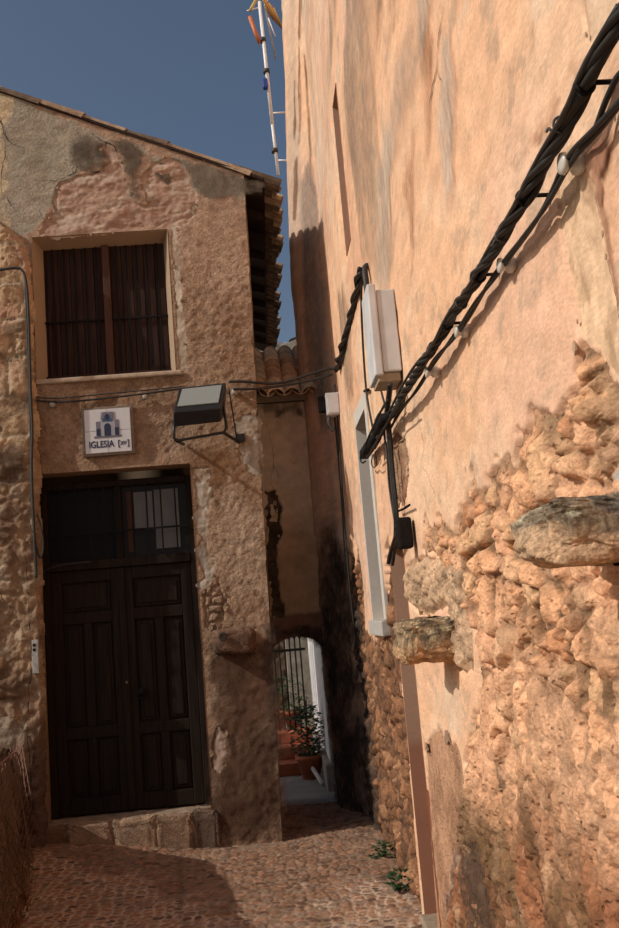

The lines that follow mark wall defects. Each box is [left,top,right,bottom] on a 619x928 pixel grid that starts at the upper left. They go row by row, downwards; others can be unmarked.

crack [0,121,24,205]
leakage [71,140,105,170]
leakage [115,140,142,197]
leakage [184,162,264,197]
peeling [41,143,196,376]
peeling [232,409,264,477]
peeling [192,468,228,631]
spalling [351,169,619,928]
leakage [210,528,381,838]
peeling [209,727,229,773]